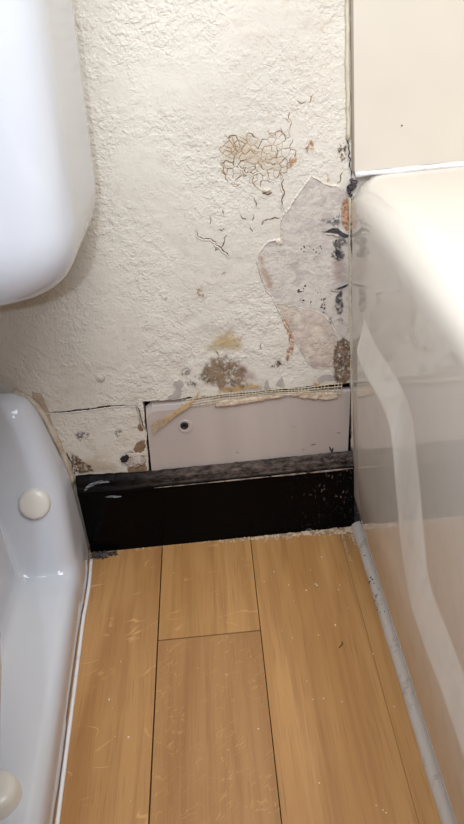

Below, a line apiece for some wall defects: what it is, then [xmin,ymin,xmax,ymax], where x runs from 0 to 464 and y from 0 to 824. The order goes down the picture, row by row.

crack [194,96,312,259]
peeling [256,175,349,338]
leakage [182,358,259,392]
leakage [333,338,351,386]
flaking render [32,392,52,424]
flaking render [120,424,148,472]